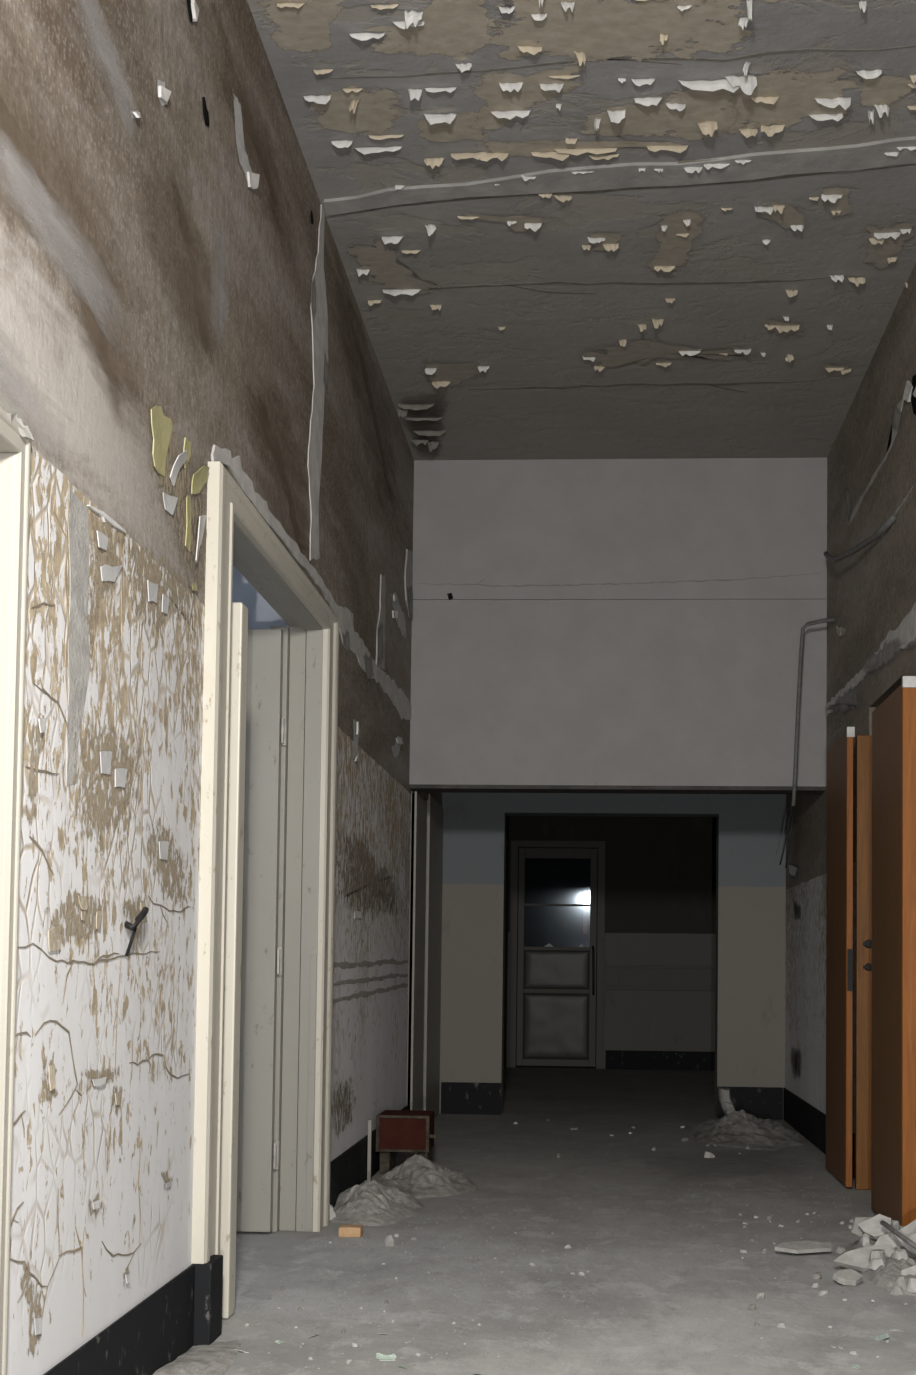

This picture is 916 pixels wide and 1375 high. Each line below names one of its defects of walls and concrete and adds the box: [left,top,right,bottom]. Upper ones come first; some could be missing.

spalling [232,90,260,189]
peeling [302,0,916,174]
peeling [347,224,443,310]
crack [331,164,916,294]
peeling [830,222,915,287]
peeling [86,396,209,666]
peeling [25,705,46,833]
peeling [73,712,192,908]
peeling [44,888,147,955]
crack [16,895,191,1115]
crack [13,1110,26,1138]
crack [10,1127,142,1336]